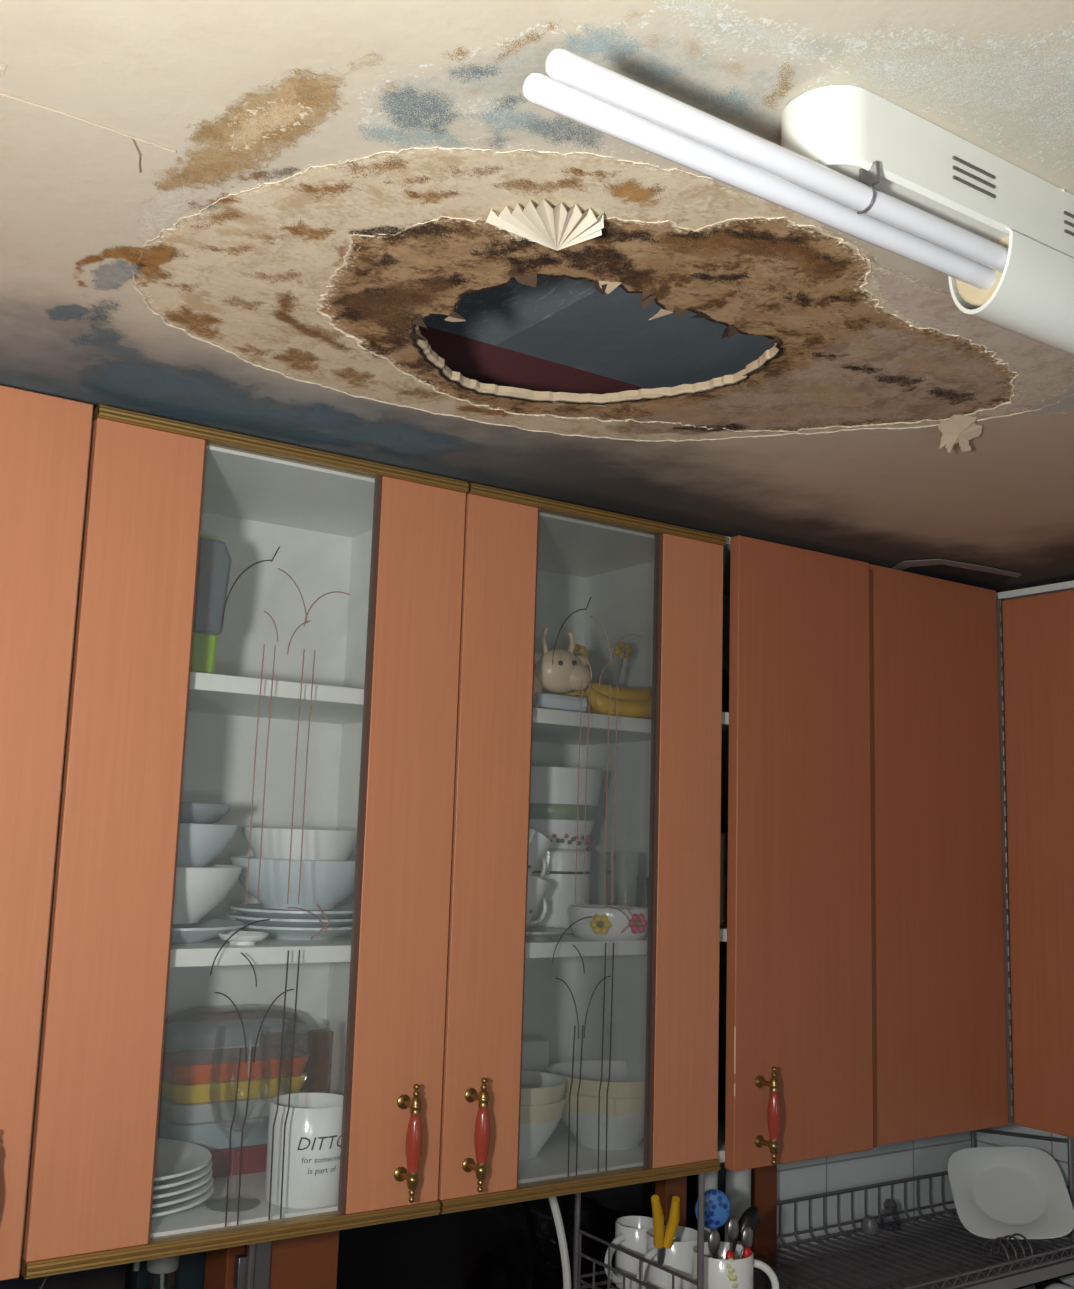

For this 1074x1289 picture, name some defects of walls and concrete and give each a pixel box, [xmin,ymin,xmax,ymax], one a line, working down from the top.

leakage [153,0,1074,192]
peeling [128,144,1074,453]
leakage [315,214,1074,437]